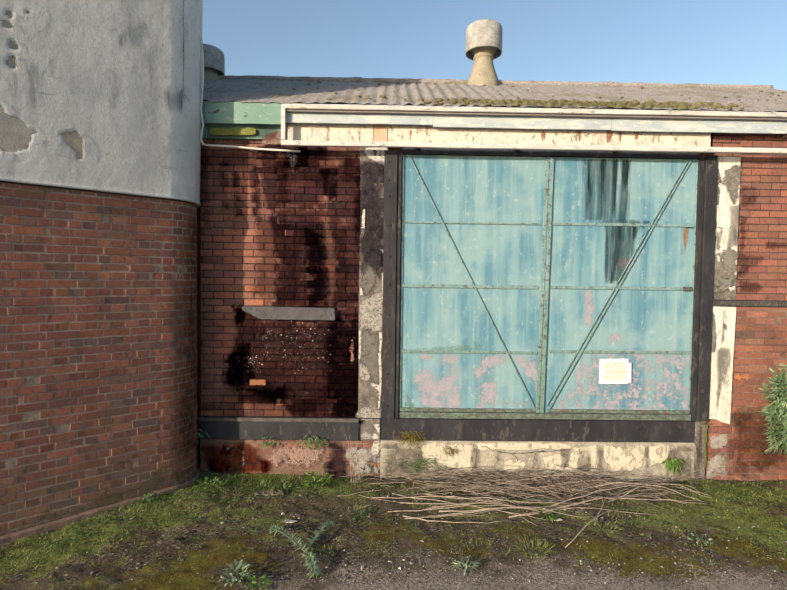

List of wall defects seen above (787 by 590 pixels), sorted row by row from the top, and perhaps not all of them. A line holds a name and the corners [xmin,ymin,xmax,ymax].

flaking render [0,104,37,152]
flaking render [61,131,84,159]
spalling [716,165,742,205]
spalling [713,222,738,294]
water stain [223,146,384,422]
peeling [582,289,595,327]
spalling [711,313,727,352]
peeling [412,353,464,408]
peeling [473,354,537,409]
peeling [553,333,690,410]
corrosion [203,444,268,474]
peeling [420,441,671,479]